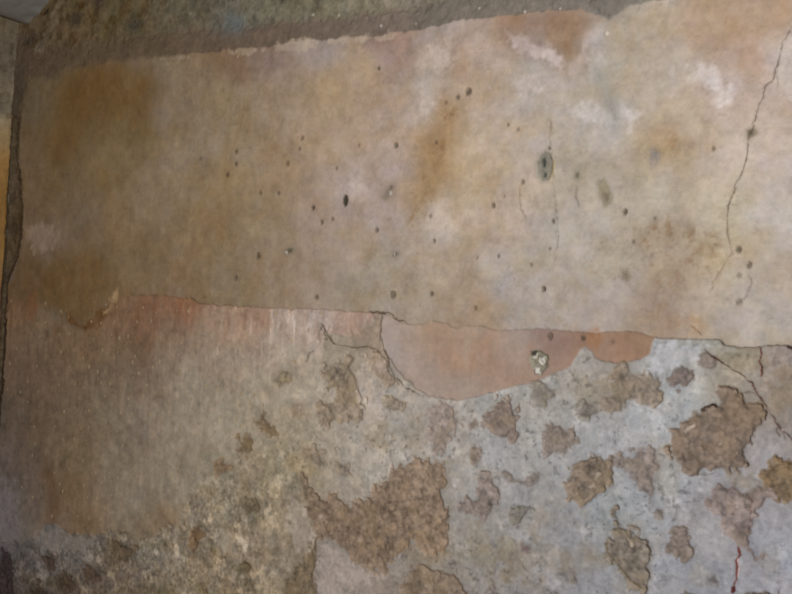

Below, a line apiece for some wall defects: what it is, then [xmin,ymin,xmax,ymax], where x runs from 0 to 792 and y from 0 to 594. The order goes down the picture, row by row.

water stain [205,0,399,59]
water stain [503,3,647,139]
water stain [665,57,739,111]
water stain [35,53,194,206]
crack [709,25,792,293]
crack [305,310,421,397]
crack [690,324,792,441]
flaking render [211,402,282,479]
flaking render [274,348,792,594]
crack [762,460,792,480]
flaking render [0,546,104,594]
flaking render [107,536,140,569]